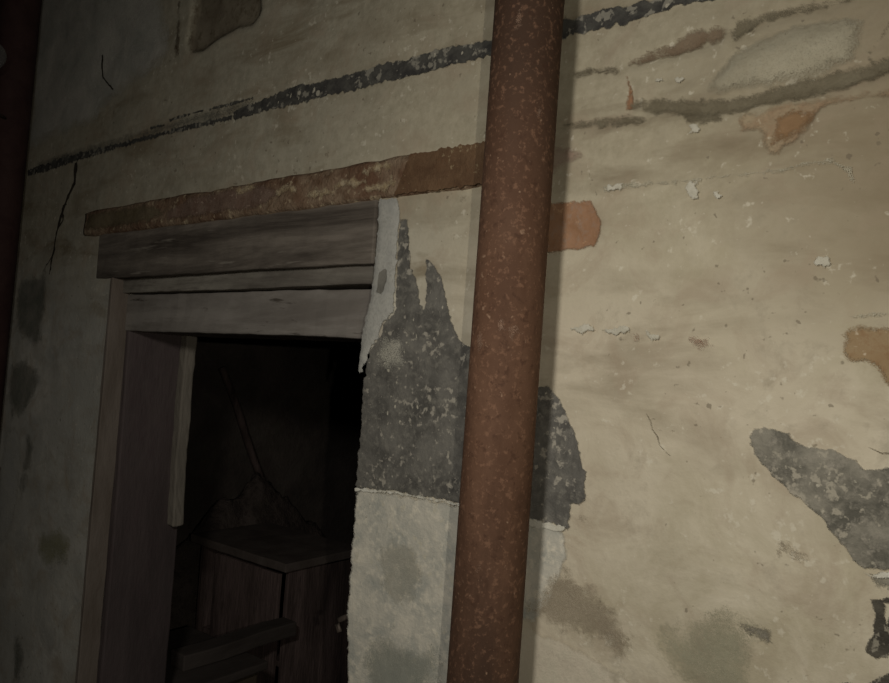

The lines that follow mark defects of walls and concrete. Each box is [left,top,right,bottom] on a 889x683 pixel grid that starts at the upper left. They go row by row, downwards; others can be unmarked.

spalling [173,0,261,60]
flaking render [548,200,602,253]
peeling [347,219,470,683]
peeling [523,386,587,623]
peeling [750,427,889,658]
flaking render [842,312,889,386]